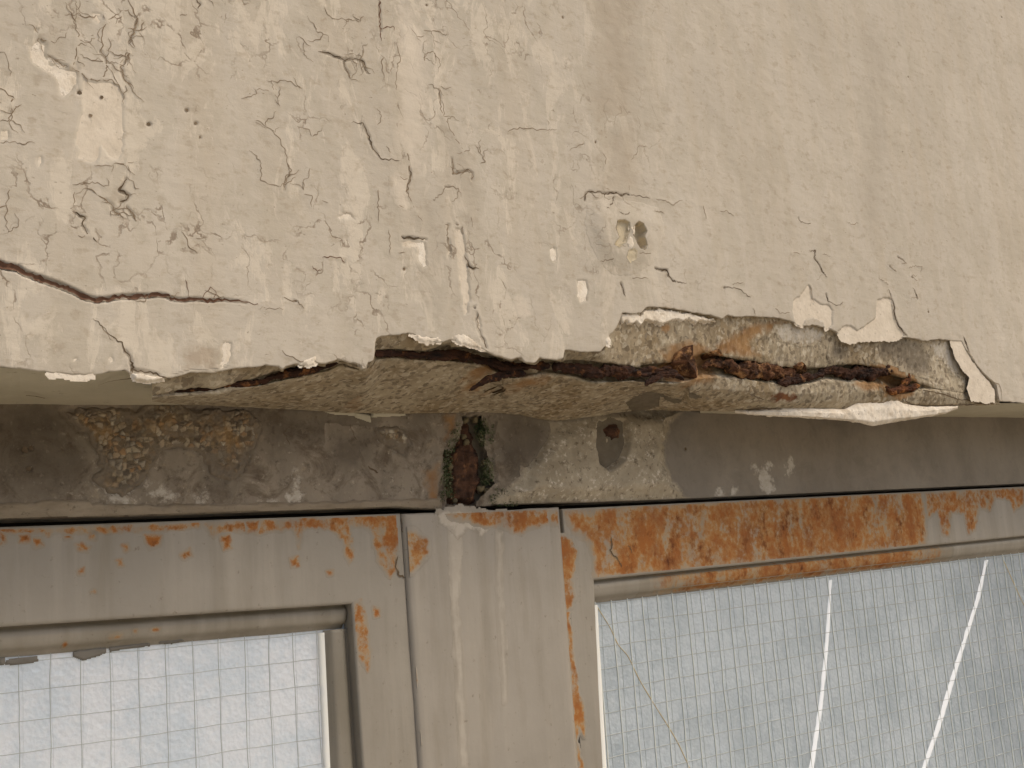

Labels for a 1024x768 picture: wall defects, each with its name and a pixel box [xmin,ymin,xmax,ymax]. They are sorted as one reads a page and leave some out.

crack [241,1,488,277]
crack [570,144,731,215]
crack [621,252,686,295]
crack [0,261,304,382]
corrosion [174,362,339,393]
spalling [129,229,999,768]
corrosion [0,515,434,580]
corrosion [374,317,1024,768]
corrosion [354,597,382,674]